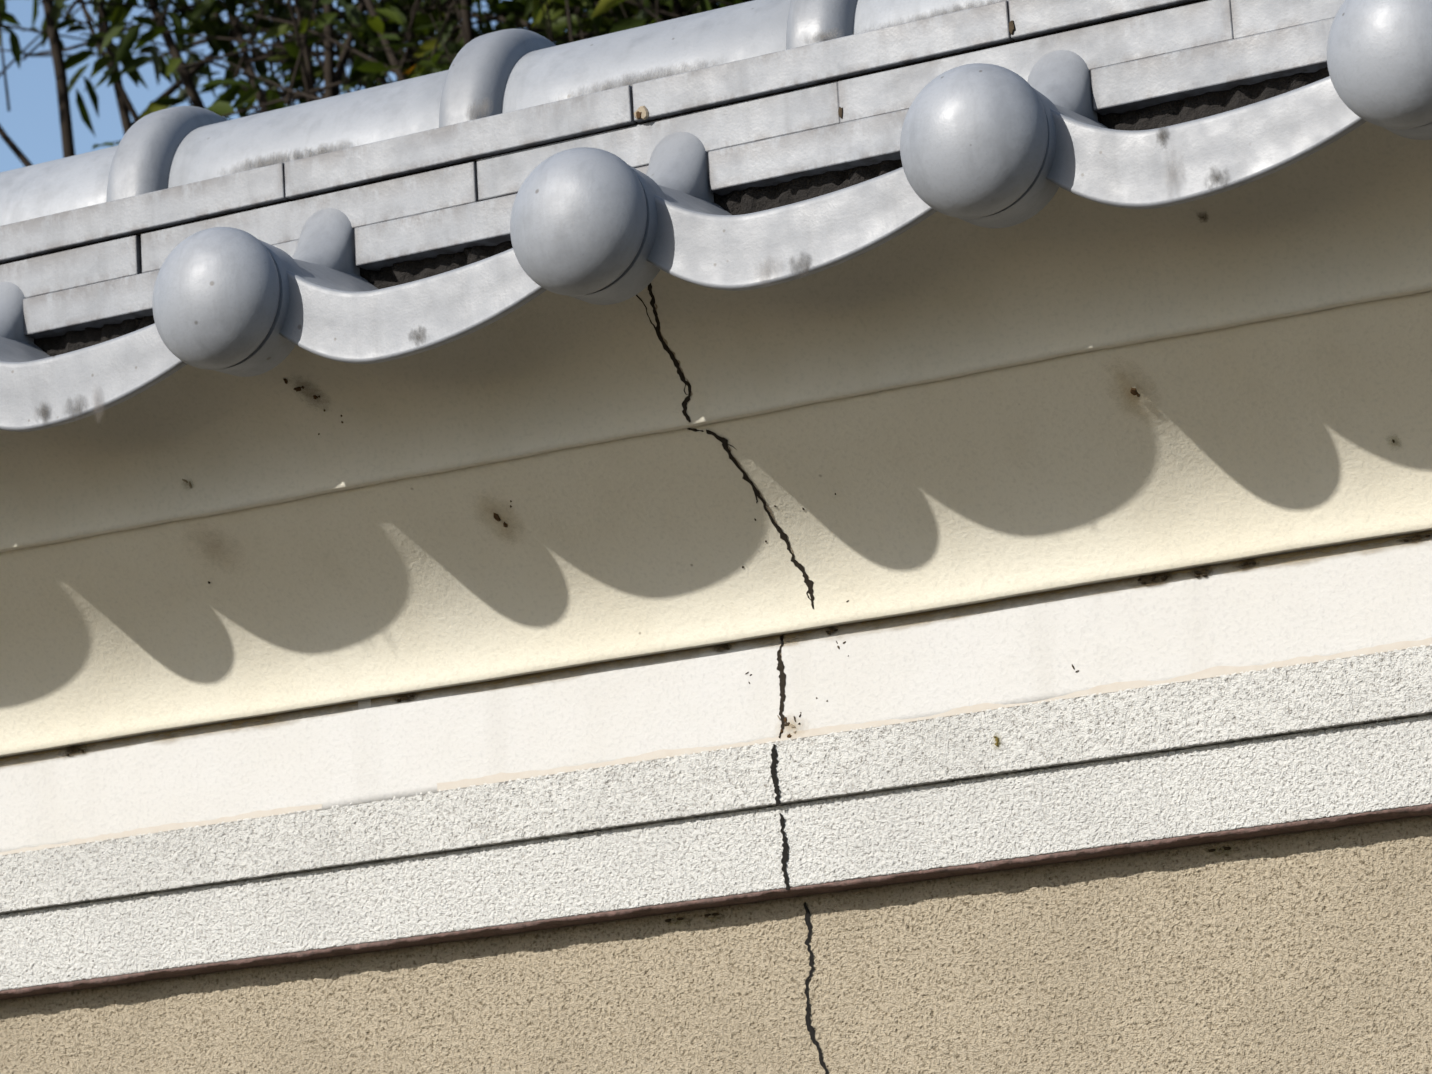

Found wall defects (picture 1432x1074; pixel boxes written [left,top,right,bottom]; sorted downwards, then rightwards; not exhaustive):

crack [636,283,814,609]
crack [770,634,828,1074]